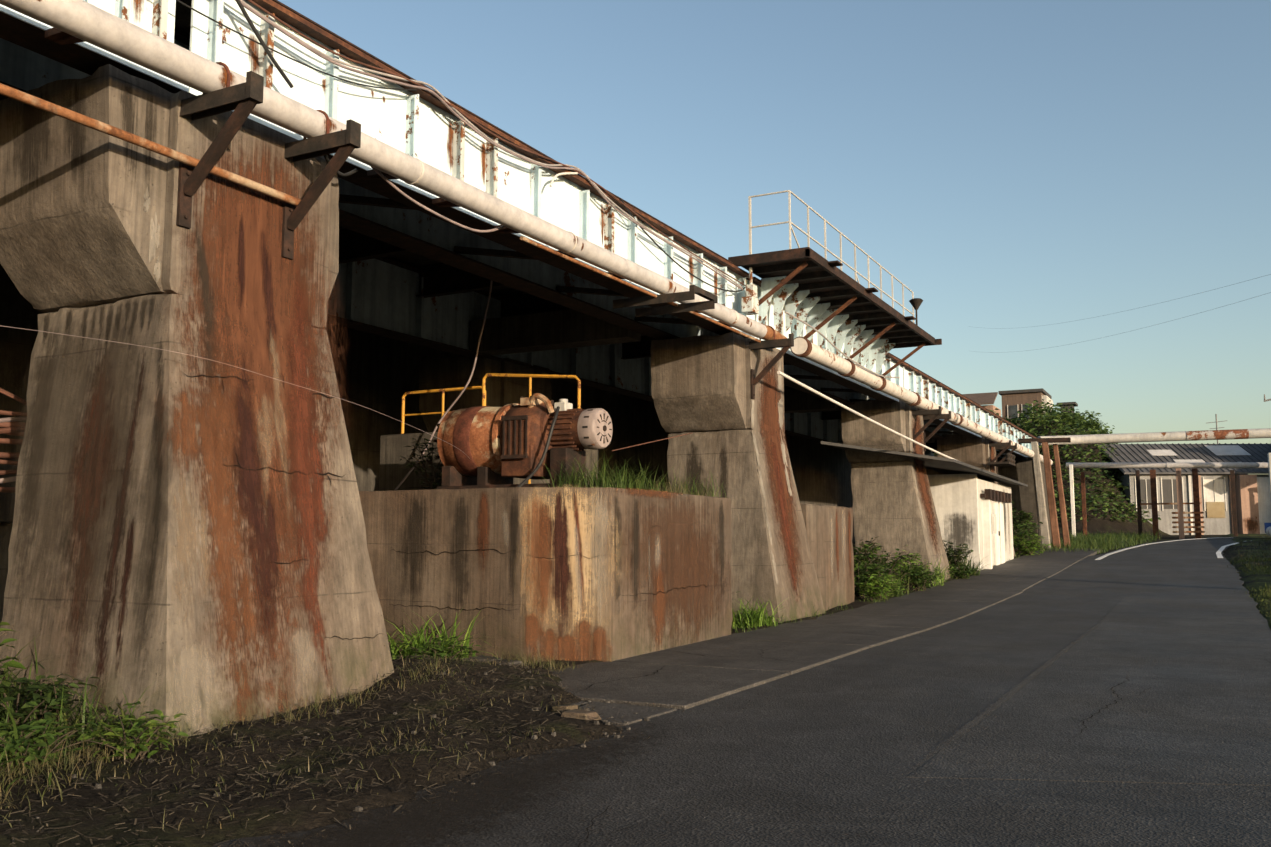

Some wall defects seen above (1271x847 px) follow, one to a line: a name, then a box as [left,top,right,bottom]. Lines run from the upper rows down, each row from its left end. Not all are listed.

leakage [66,297,155,345]
leakage [146,345,164,599]
rust [168,151,340,715]
rust [478,493,490,568]
rust [522,493,610,661]
rust [759,357,800,593]